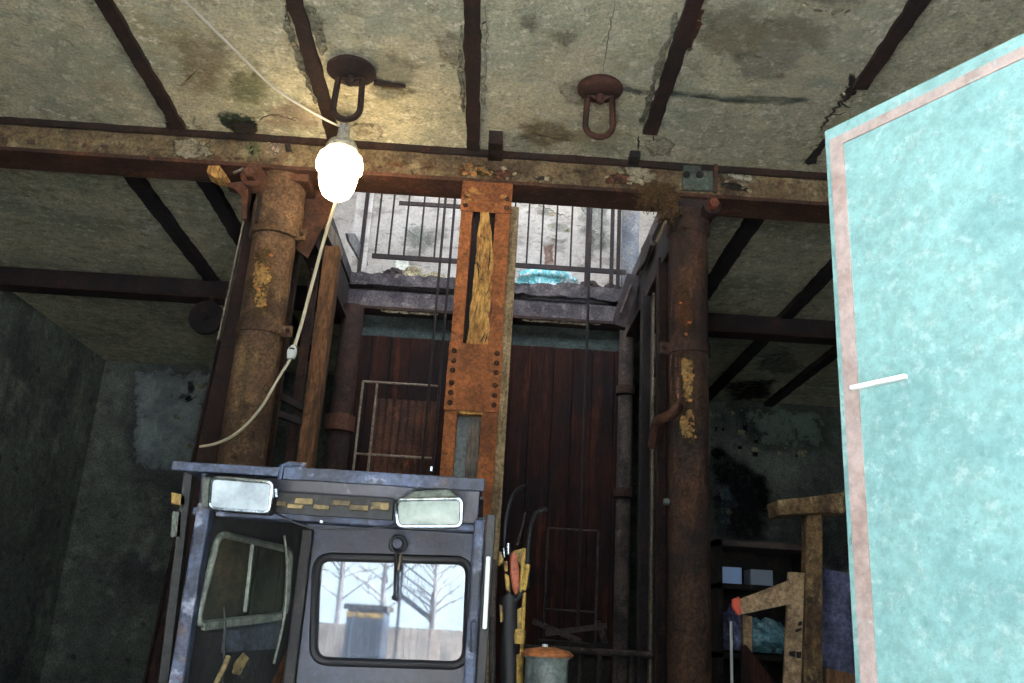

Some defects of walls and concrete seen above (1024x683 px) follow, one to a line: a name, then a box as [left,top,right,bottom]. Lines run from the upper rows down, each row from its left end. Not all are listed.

spalling [283,6,317,104]
spalling [305,5,327,56]
spalling [639,13,678,124]
crack [820,98,851,131]
leakage [710,448,771,541]